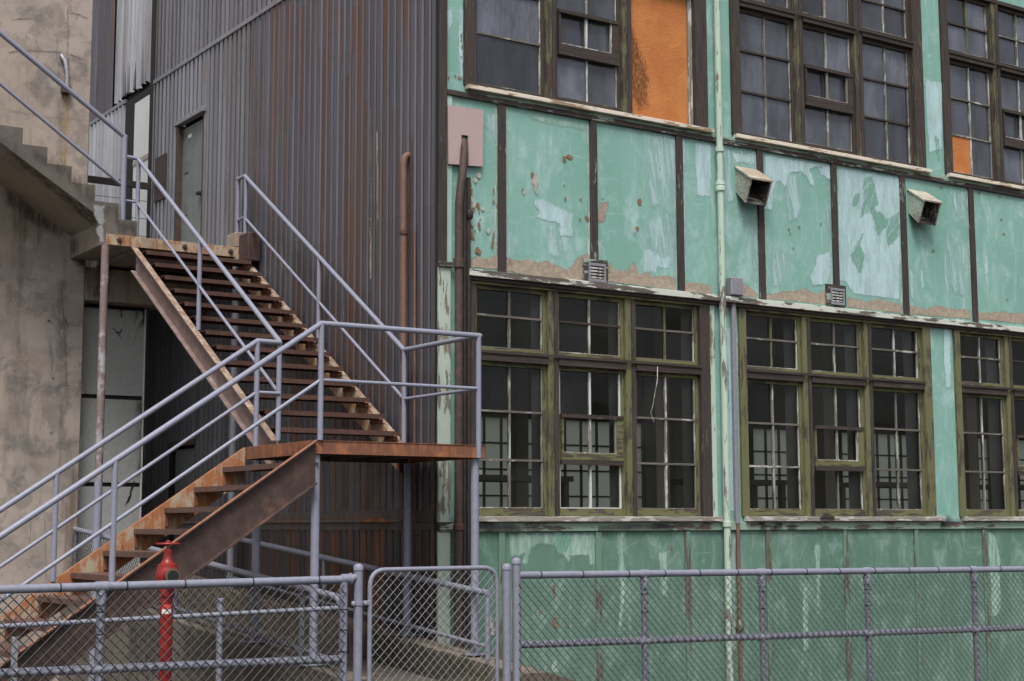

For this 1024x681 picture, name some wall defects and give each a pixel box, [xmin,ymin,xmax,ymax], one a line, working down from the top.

spalling [466,173,590,280]
spalling [608,262,712,294]
spalling [741,283,826,304]